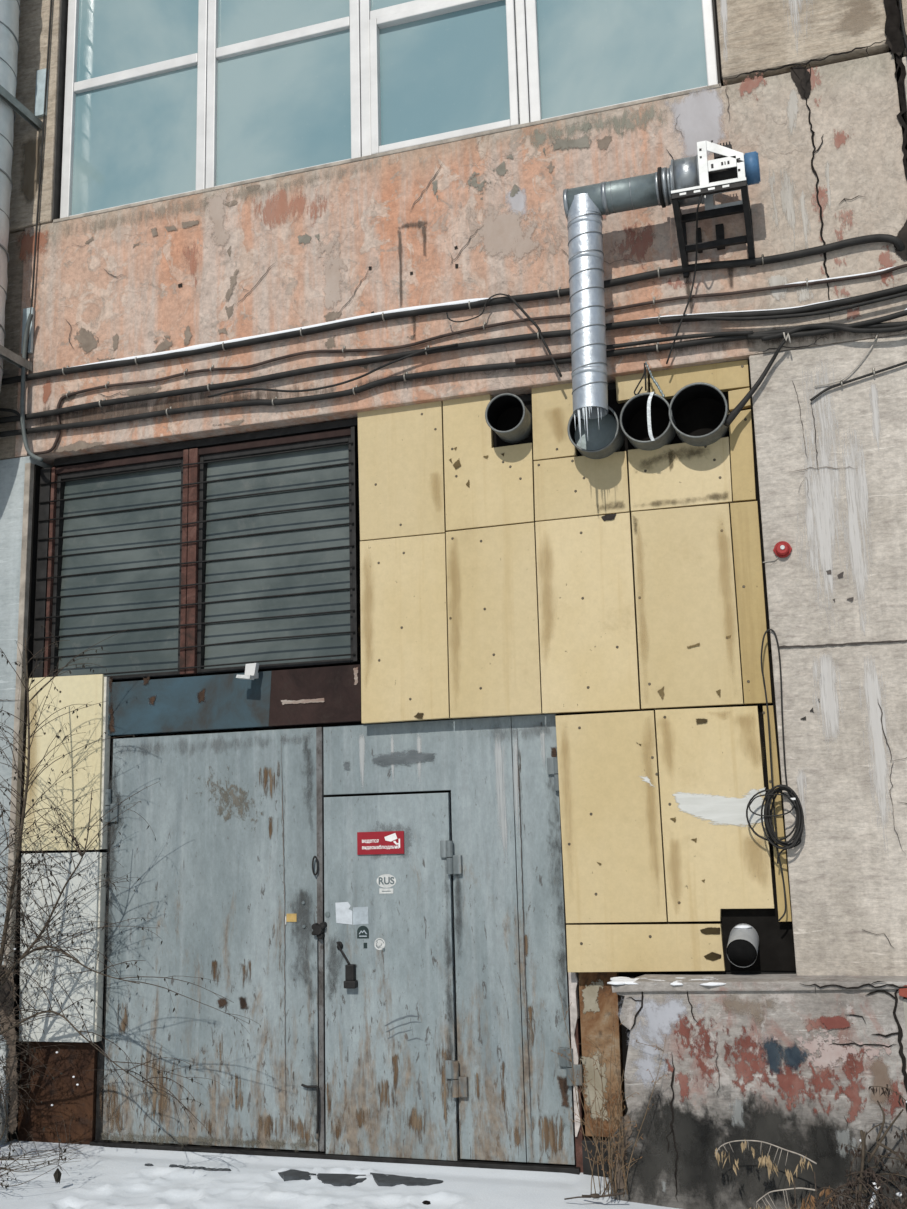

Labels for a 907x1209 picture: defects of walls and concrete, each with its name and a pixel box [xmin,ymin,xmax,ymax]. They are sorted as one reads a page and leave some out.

crack [725,40,907,353]
peeling [74,327,119,362]
peeling [122,386,161,396]
peeling [151,326,193,354]
damp [801,366,869,634]
crack [878,703,907,852]
corrosion [218,962,251,1009]
corrosion [259,1072,312,1145]
corrosion [325,1054,400,1140]
damp [612,1091,907,1209]
peeling [630,997,905,1123]
crack [802,981,907,1111]